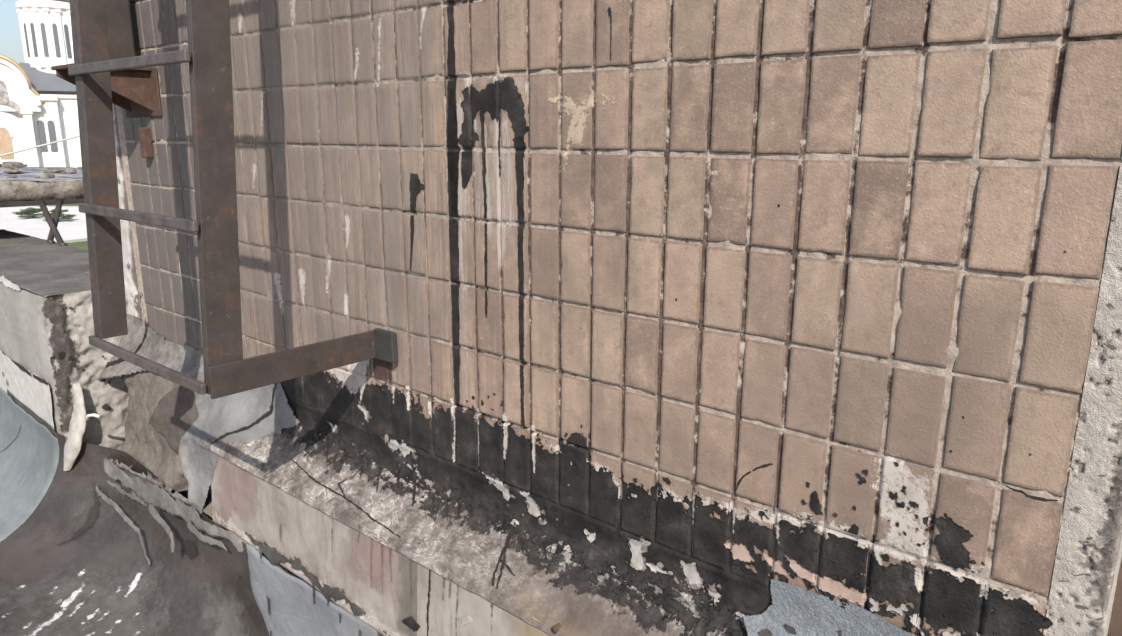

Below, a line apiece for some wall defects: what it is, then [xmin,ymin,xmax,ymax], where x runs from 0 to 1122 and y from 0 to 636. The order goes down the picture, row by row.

leakage [271,0,1053,636]
spalling [41,297,85,442]
crack [213,383,276,444]
crack [291,459,400,538]
crack [736,463,773,490]
spalling [855,454,934,560]
peeling [213,514,304,575]
crack [492,526,515,586]
peeling [23,571,121,636]
peeling [319,581,420,636]